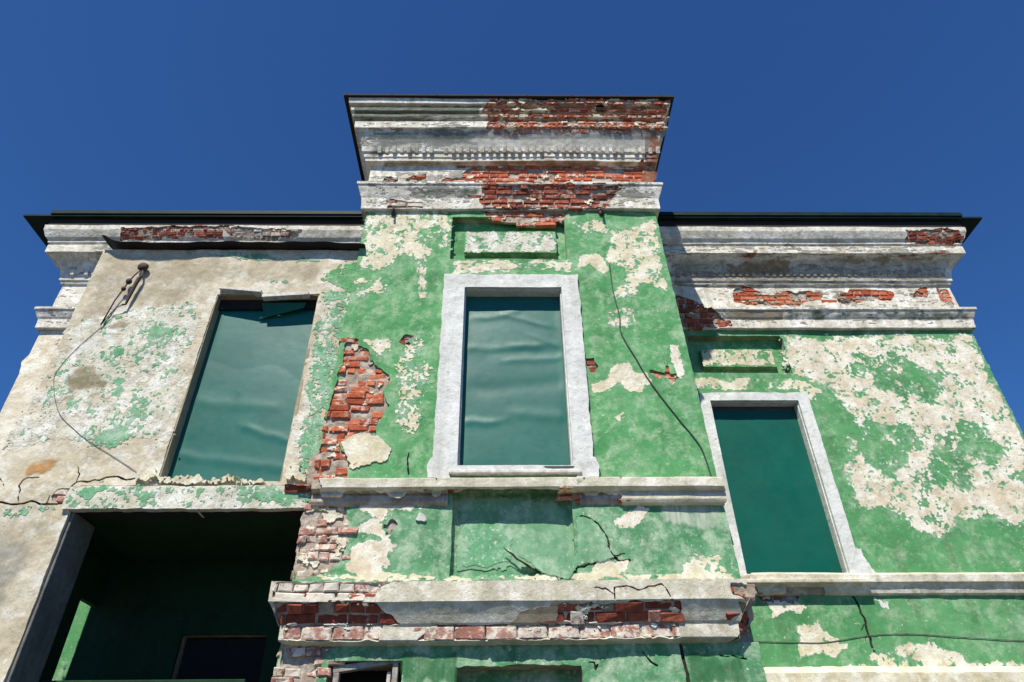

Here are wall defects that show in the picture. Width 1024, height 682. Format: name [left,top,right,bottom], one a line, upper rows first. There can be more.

flaking render [358,98,670,150]
peeling [1,159,1024,682]
crack [0,467,135,505]
crack [503,516,671,599]
crack [852,596,875,652]